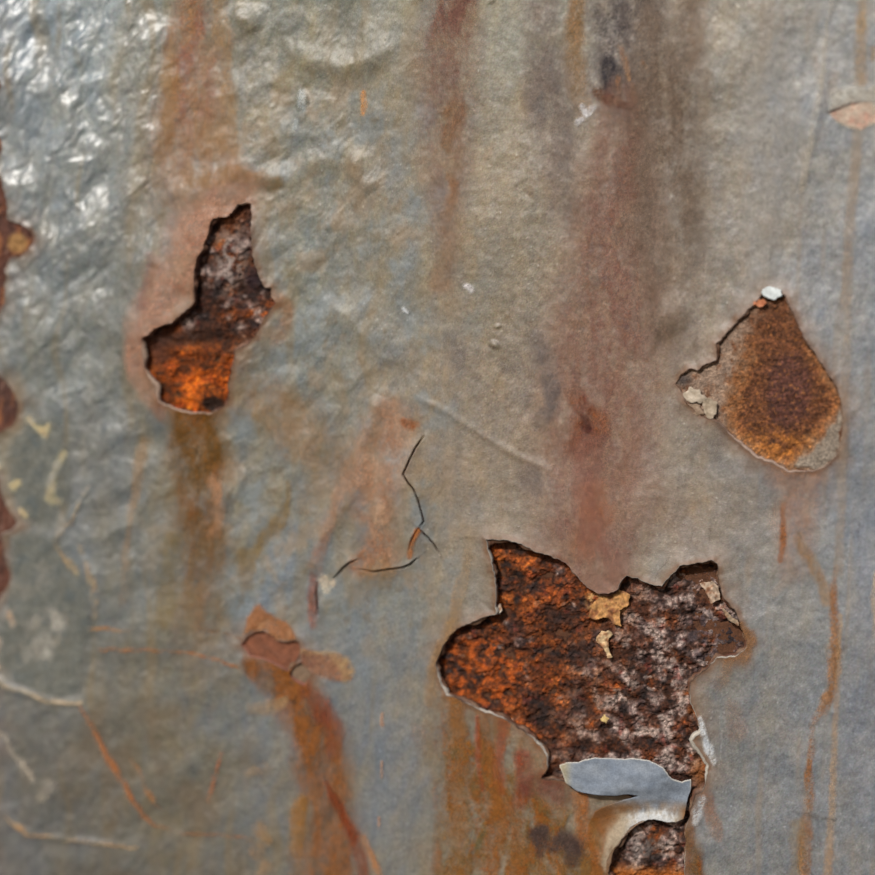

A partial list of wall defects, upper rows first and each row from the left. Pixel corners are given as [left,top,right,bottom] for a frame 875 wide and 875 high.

peeling [828,87,875,130]
corrosion [0,178,35,313]
peeling [141,202,277,415]
corrosion [0,376,19,432]
peeling [675,286,843,473]
corrosion [0,490,20,603]
crack [374,440,438,572]
peeling [240,605,353,685]
corrosion [243,660,376,875]
corrosion [437,697,602,875]
peeling [436,539,747,875]